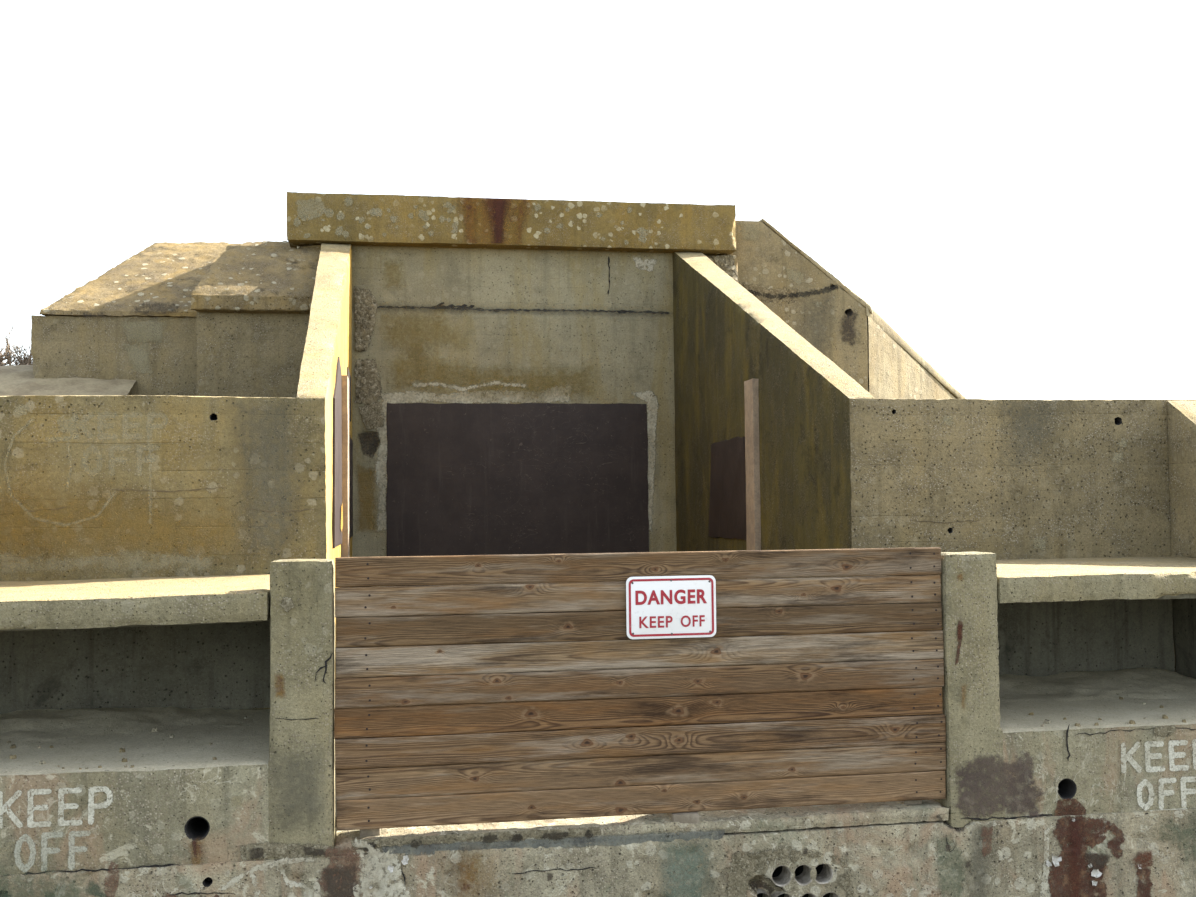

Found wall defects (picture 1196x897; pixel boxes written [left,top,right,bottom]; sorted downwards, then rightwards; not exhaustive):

rust [457,197,530,244]
damp [842,313,857,346]
spalling [354,286,385,458]
crack [1066,724,1196,760]
rust [1046,799,1153,897]